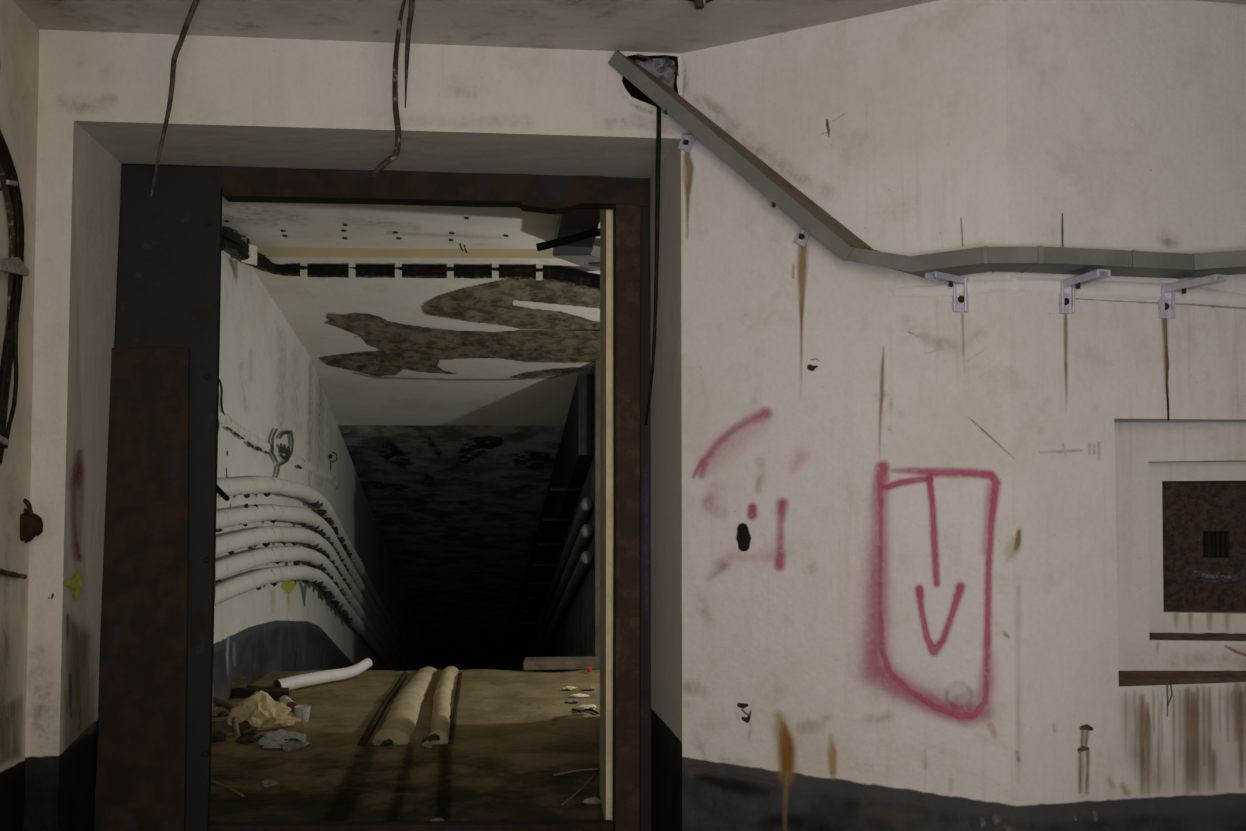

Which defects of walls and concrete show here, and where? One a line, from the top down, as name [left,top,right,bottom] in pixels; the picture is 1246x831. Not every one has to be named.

spalling [622,76,662,109]
spalling [626,54,679,93]
peeling [319,279,600,379]
rust [778,717,793,796]
rust [1077,724,1093,787]